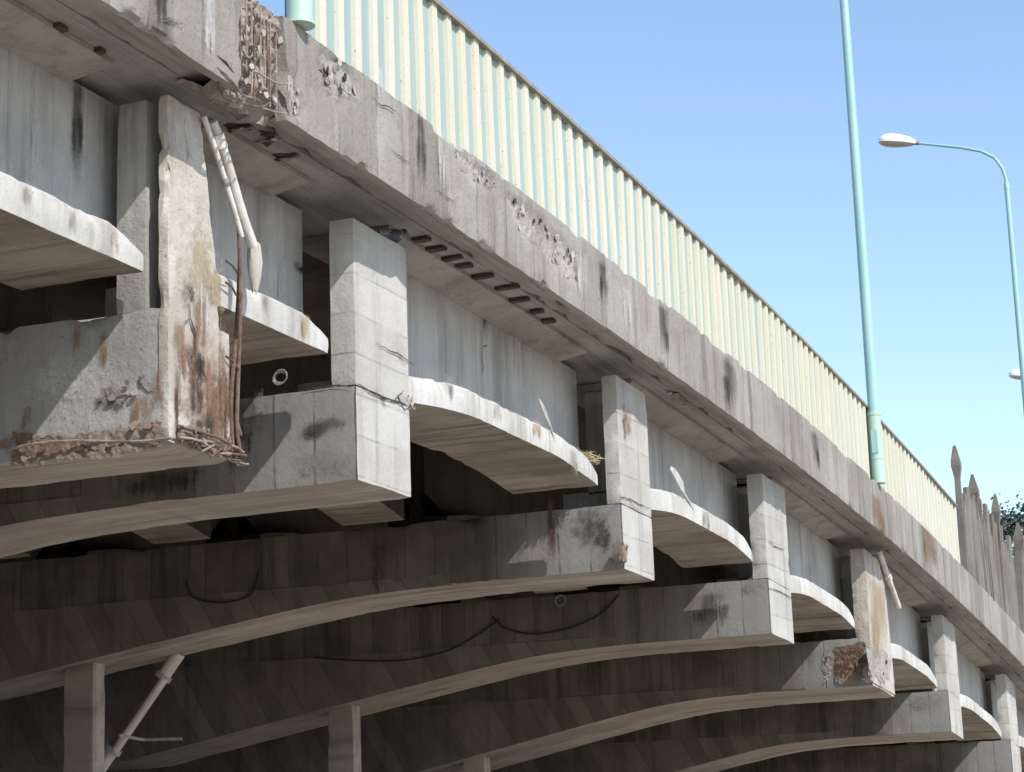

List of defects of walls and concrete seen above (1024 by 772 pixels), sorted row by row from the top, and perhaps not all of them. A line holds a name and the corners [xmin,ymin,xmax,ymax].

spalling [175,0,300,161]
spalling [318,53,356,104]
damp [73,87,82,158]
spalling [454,152,495,191]
spalling [507,198,578,281]
spalling [4,233,249,468]
rust [131,233,230,437]
crack [305,384,413,409]
spalling [821,641,891,686]